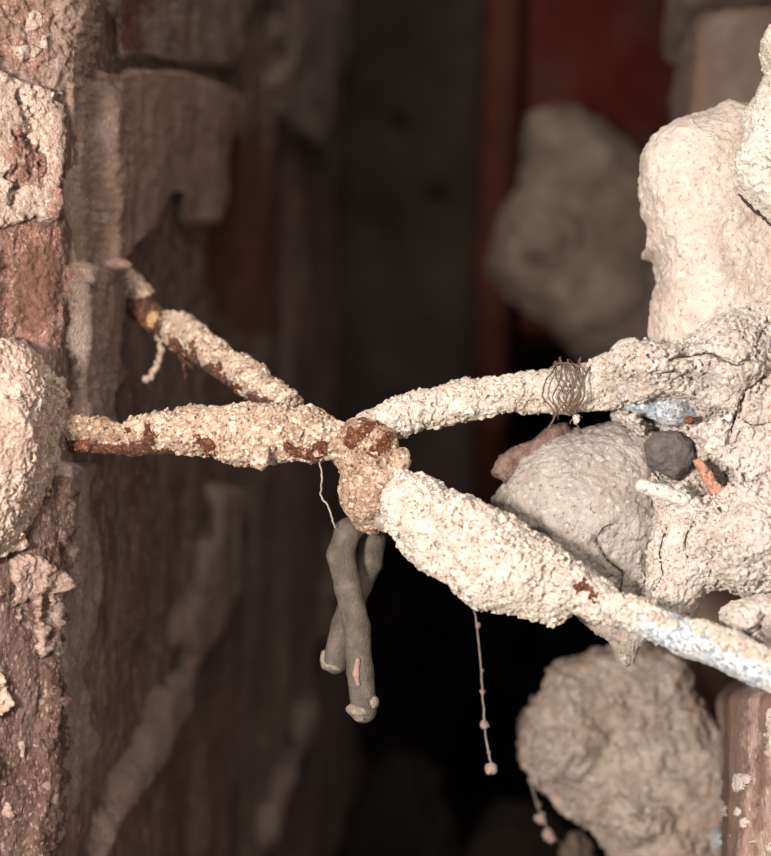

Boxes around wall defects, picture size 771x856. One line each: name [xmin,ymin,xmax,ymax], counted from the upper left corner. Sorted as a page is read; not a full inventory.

crack [738,193,771,226]
corrosion [125,297,153,333]
corrosion [166,337,197,359]
corrosion [233,383,283,405]
crack [652,322,771,439]
corrosion [69,423,159,453]
corrosion [192,434,218,460]
corrosion [283,440,328,464]
corrosion [342,417,393,459]
corrosion [572,576,599,604]
flaking render [0,475,83,856]